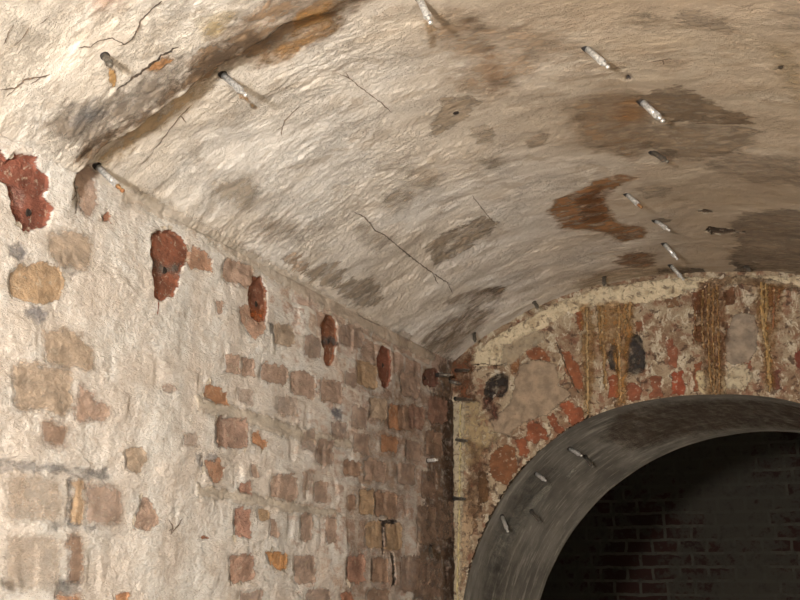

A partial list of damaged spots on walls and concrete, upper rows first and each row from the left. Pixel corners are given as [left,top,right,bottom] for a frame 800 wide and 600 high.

crack [0,74,50,96]
crack [78,1,162,48]
crack [116,47,178,91]
leakage [46,0,358,165]
leakage [636,85,800,186]
spalling [0,150,91,305]
spalling [150,225,295,347]
corrosion [547,175,647,241]
flaking render [470,274,800,420]
corrosion [693,282,728,395]
leakage [729,209,800,274]
corrosion [756,285,783,390]